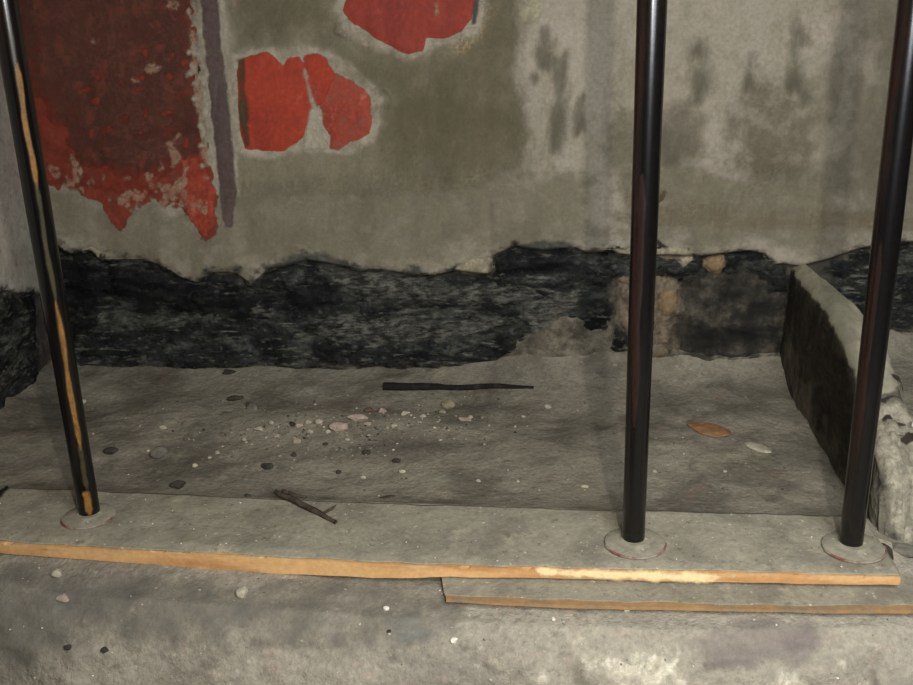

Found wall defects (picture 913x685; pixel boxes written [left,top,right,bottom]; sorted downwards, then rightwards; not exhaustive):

peeling [333,0,492,60]
peeling [19,0,219,241]
peeling [230,44,384,159]
water stain [533,32,566,150]
water stain [662,108,697,161]
water stain [738,88,809,176]
flaking render [58,241,630,370]
spalling [652,247,791,361]